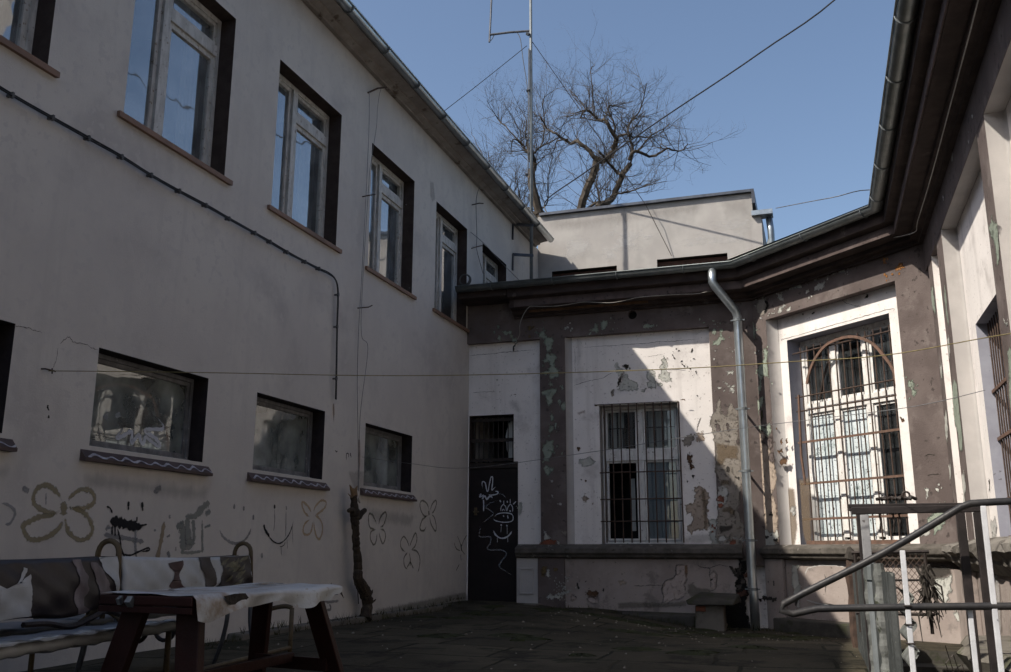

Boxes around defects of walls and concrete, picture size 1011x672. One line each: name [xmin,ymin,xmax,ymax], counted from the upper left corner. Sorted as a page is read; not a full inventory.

spalling [753,277,828,339]
peeling [534,321,564,406]
peeling [611,348,697,397]
spalling [682,370,745,544]
spalling [755,345,788,545]